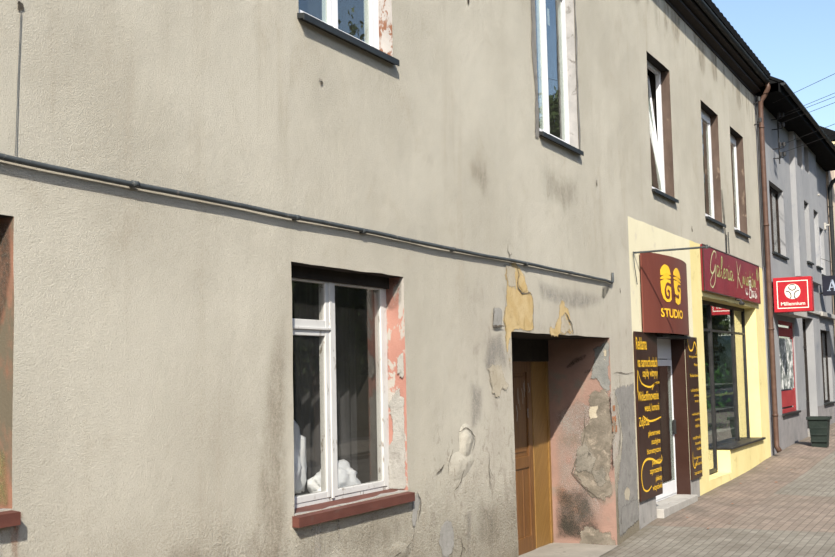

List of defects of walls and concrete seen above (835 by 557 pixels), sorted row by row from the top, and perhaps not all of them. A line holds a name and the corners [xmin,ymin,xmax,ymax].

flaking render [493,262,534,351]
flaking render [550,300,574,337]
peeling [389,388,406,489]
flaking render [571,341,621,501]
flaking render [412,494,421,538]